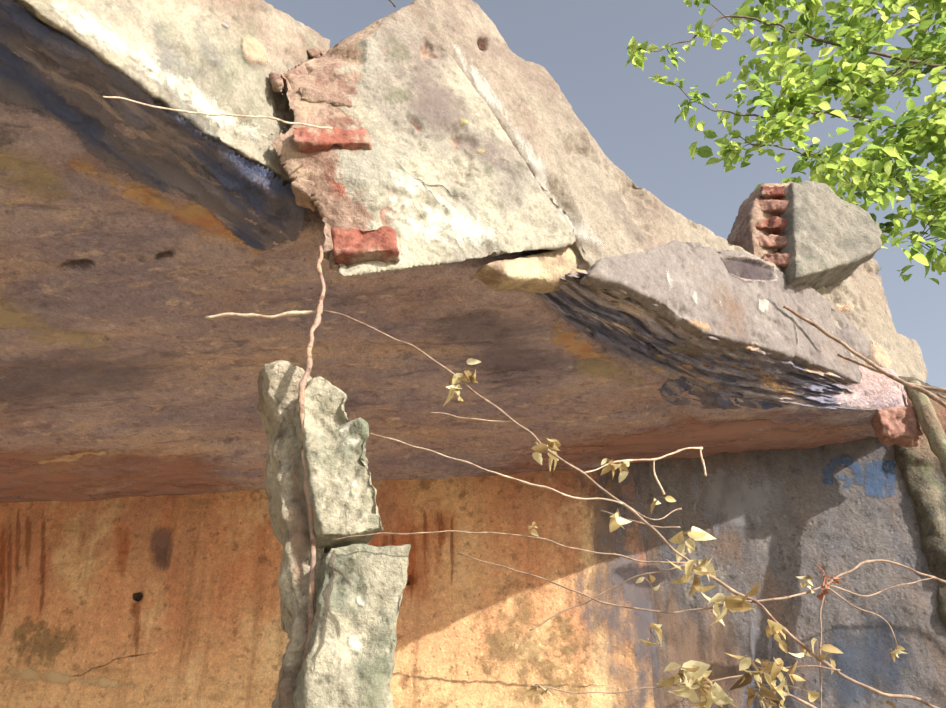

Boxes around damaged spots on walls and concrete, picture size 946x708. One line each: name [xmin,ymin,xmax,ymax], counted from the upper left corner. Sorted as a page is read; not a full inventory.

corrosion [0,516,45,625]
leakage [151,529,171,569]
corrosion [409,512,426,574]
corrosion [439,514,454,580]
crack [73,650,161,677]
crack [392,672,603,687]